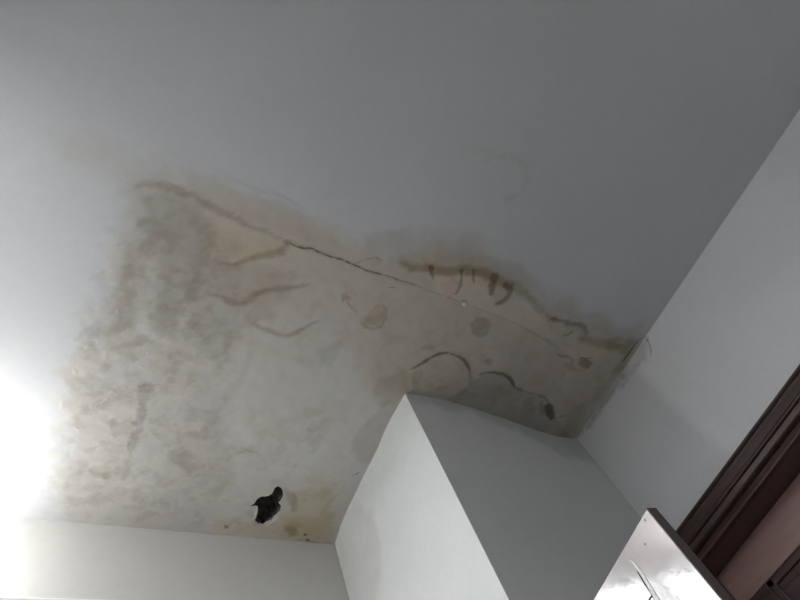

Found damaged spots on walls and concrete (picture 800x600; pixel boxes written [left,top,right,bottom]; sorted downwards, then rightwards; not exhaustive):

crack [282,237,450,300]
water stain [23,119,652,600]
spalling [251,486,283,526]